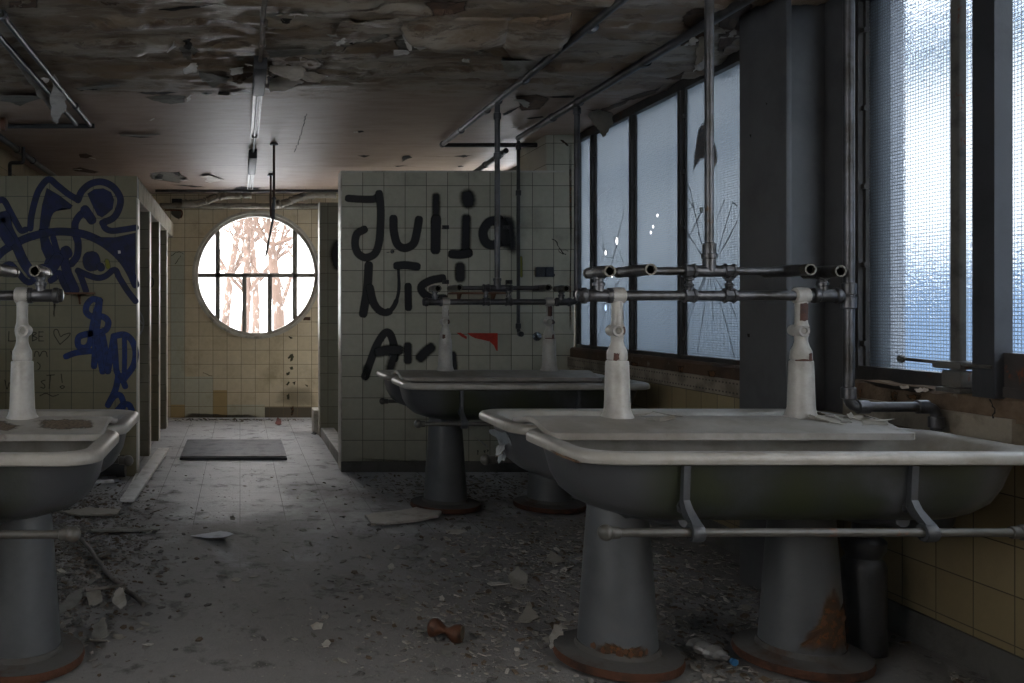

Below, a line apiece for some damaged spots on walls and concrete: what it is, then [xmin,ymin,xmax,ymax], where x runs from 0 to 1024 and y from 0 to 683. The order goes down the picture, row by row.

peeling [332,18,426,56]
peeling [0,55,67,124]
peeling [140,39,253,104]
spalling [266,56,328,92]